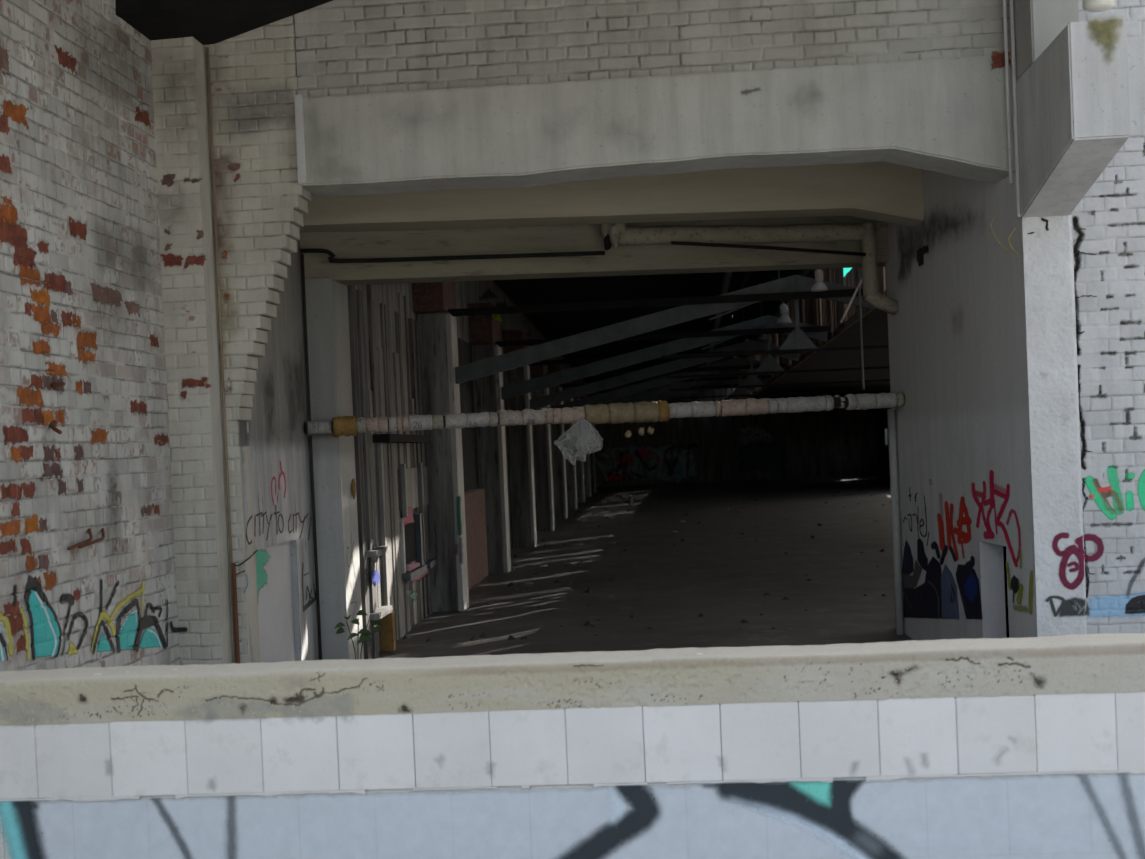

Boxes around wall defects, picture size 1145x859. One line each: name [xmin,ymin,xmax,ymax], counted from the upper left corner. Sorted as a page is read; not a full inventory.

damp [1091,19,1121,45]
peeling [55,45,77,74]
peeling [0,100,29,134]
peeling [161,229,206,269]
peeling [91,283,140,317]
crack [1028,217,1097,507]
peeling [0,196,98,591]
peeling [181,377,211,399]
peeling [74,428,109,461]
crack [1084,541,1092,598]
crack [111,685,174,714]
crack [206,672,367,706]